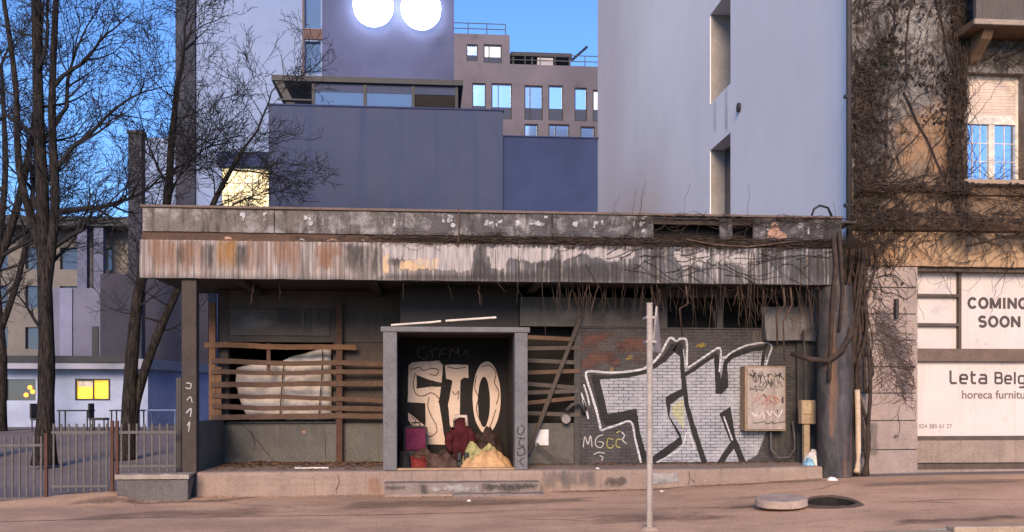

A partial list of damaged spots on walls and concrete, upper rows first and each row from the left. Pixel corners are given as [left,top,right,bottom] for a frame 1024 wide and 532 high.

spalling [766,222,787,239]
peeling [581,331,647,370]